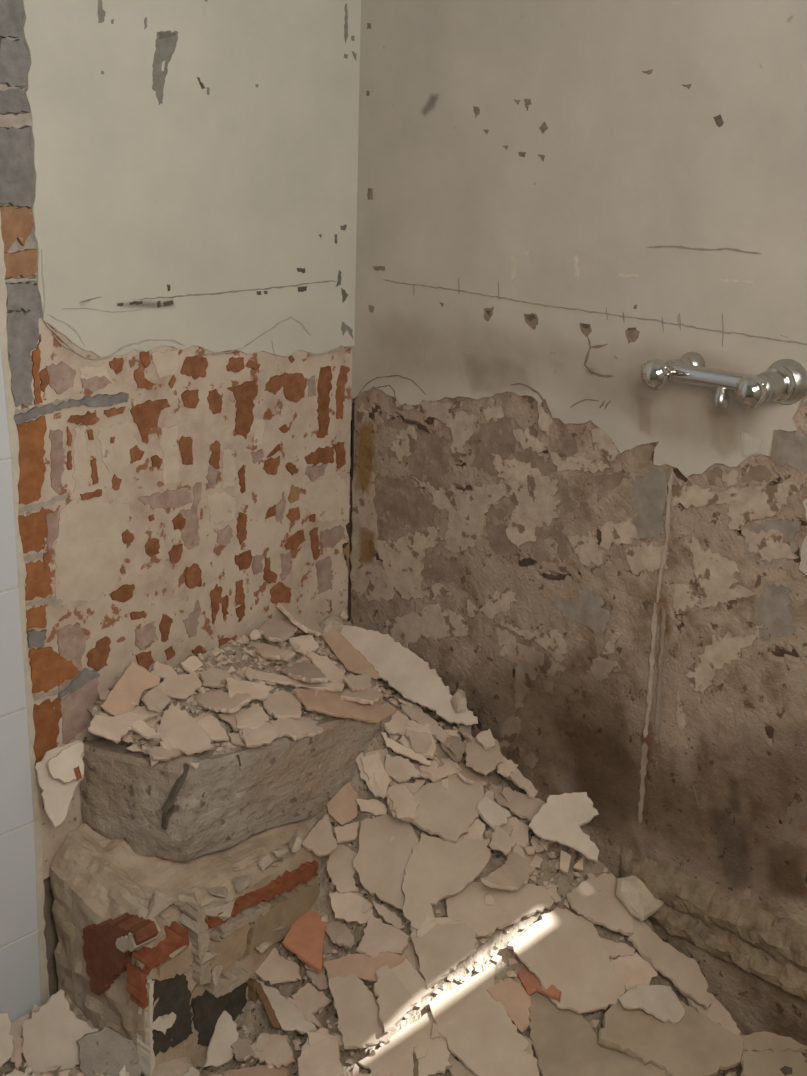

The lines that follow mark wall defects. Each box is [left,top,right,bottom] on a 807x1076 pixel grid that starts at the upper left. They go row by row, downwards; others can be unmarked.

flaking render [0,0,353,880]
spalling [323,628,395,690]
flaking render [349,387,807,1047]